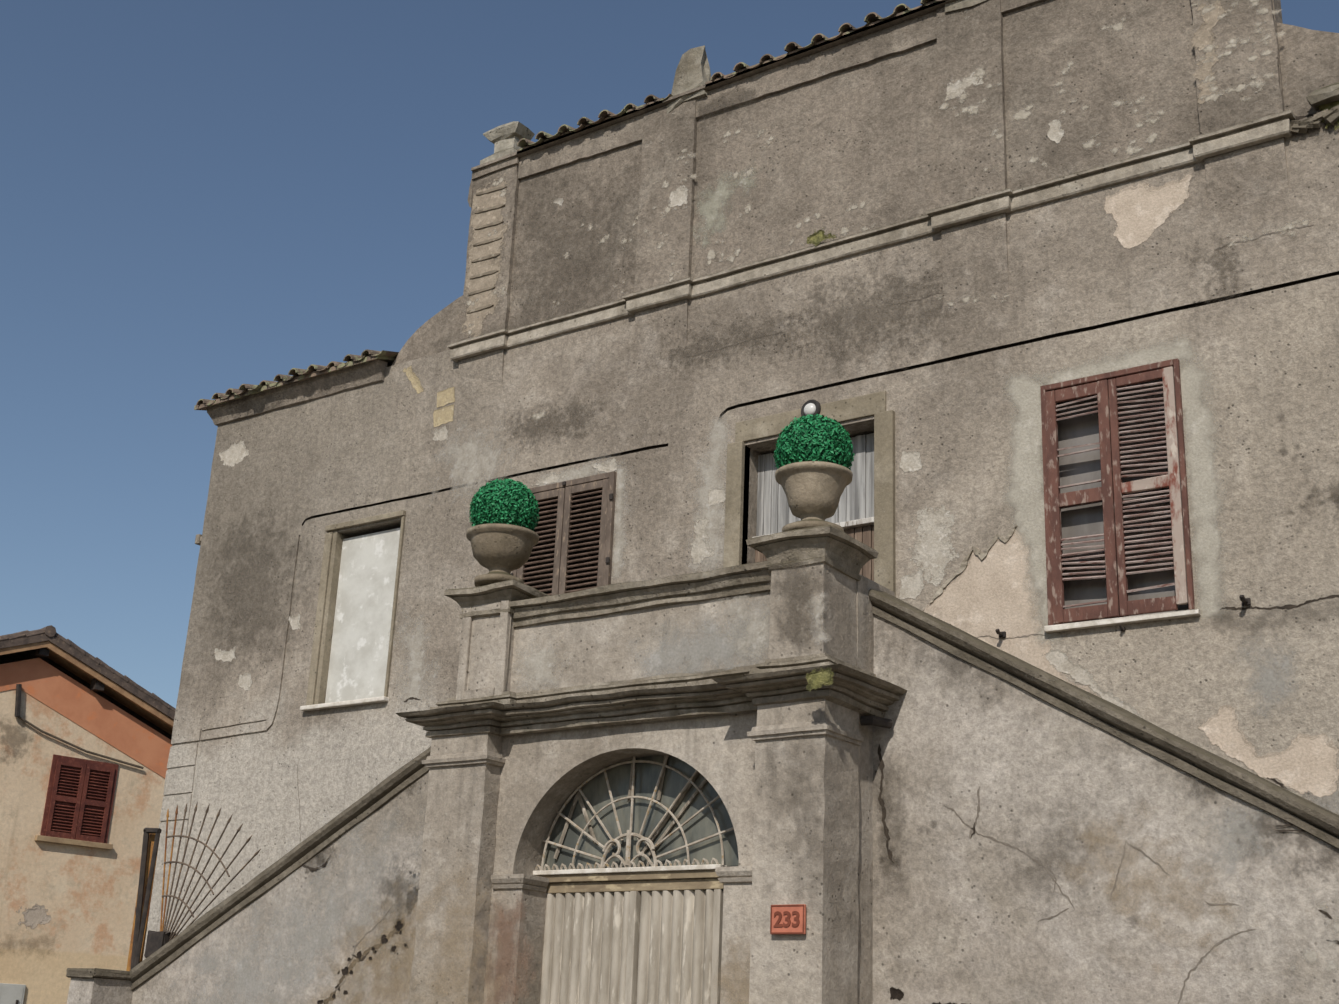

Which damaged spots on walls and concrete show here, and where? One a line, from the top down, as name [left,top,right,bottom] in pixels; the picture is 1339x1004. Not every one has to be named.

peeling [940,68,1001,116]
flaking render [1191,0,1285,104]
crack [1295,112,1317,120]
peeling [1104,174,1192,249]
flaking render [219,440,249,467]
peeling [899,504,1142,718]
crack [1220,595,1339,610]
peeling [1197,705,1339,797]
crack [878,744,894,863]
crack [317,905,407,1004]